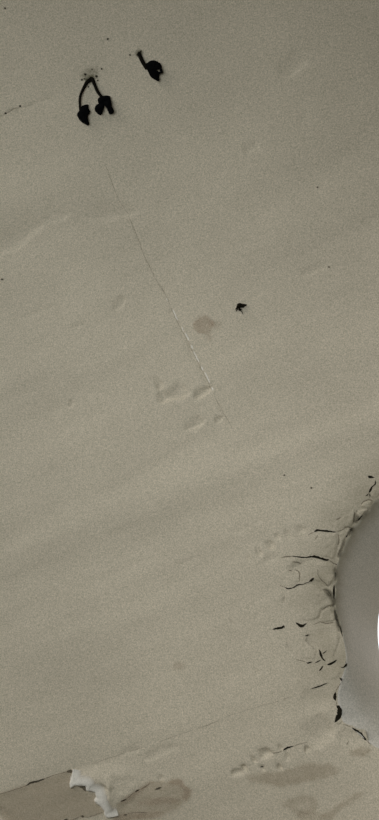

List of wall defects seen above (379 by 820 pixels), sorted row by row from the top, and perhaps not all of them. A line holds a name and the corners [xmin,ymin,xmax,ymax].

crack [314,516,362,537]
crack [285,555,343,636]
crack [273,623,367,741]
flaking render [69,757,157,818]